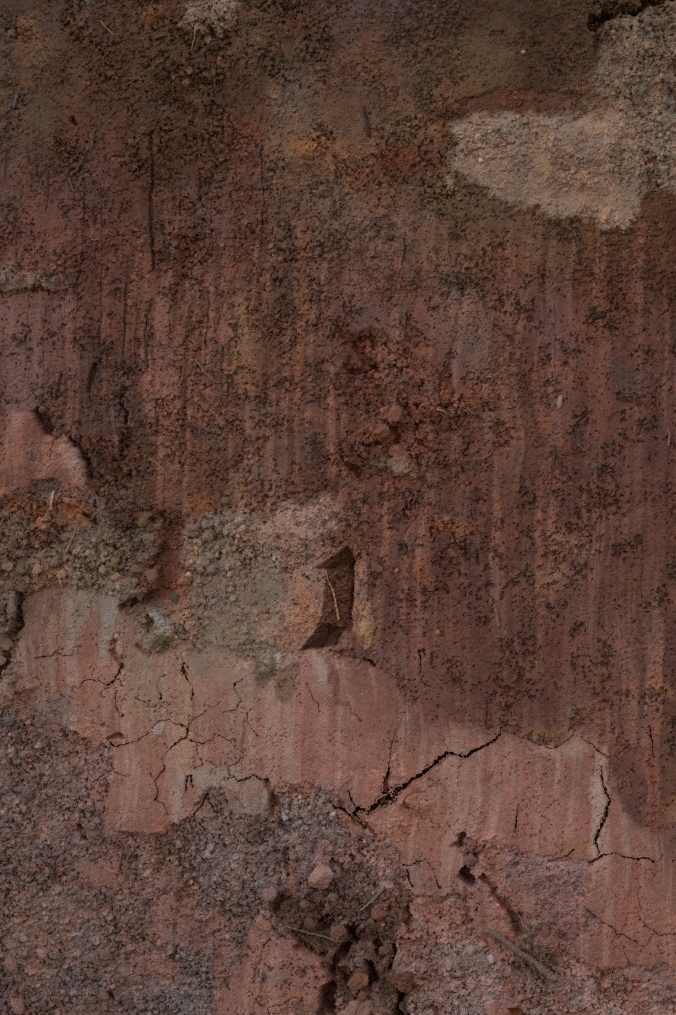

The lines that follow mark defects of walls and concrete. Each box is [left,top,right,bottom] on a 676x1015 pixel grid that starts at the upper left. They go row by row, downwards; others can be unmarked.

spalling [0,482,166,689]
spalling [0,702,279,1015]
crack [37,645,268,830]
crack [331,695,676,965]